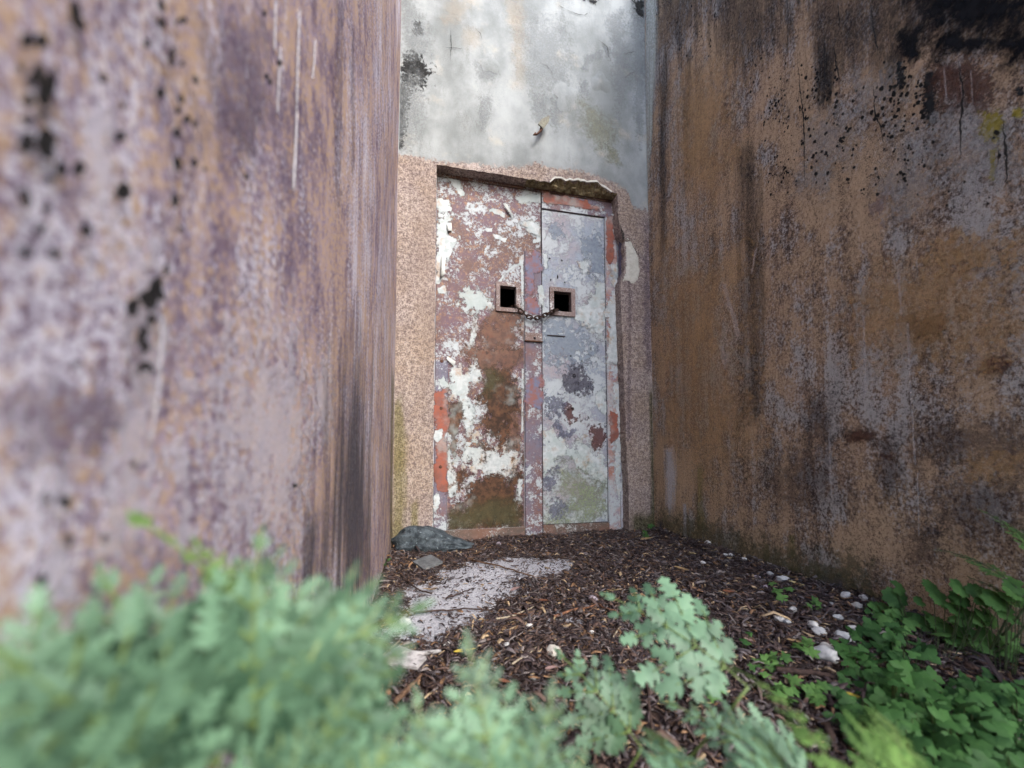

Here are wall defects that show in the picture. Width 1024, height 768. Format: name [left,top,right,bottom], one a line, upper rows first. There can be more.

leakage [399,3,437,150]
leakage [815,0,1024,127]
corrosion [448,308,524,530]
peeling [433,176,640,522]